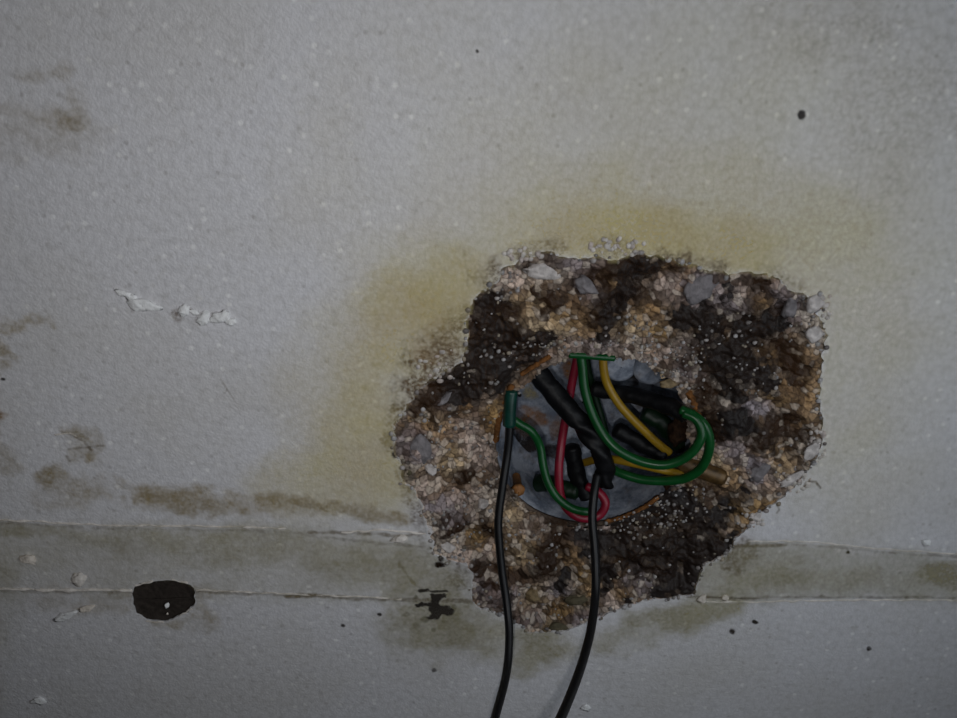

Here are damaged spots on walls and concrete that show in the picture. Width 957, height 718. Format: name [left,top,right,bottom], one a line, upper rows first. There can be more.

spalling [384,236,833,635]